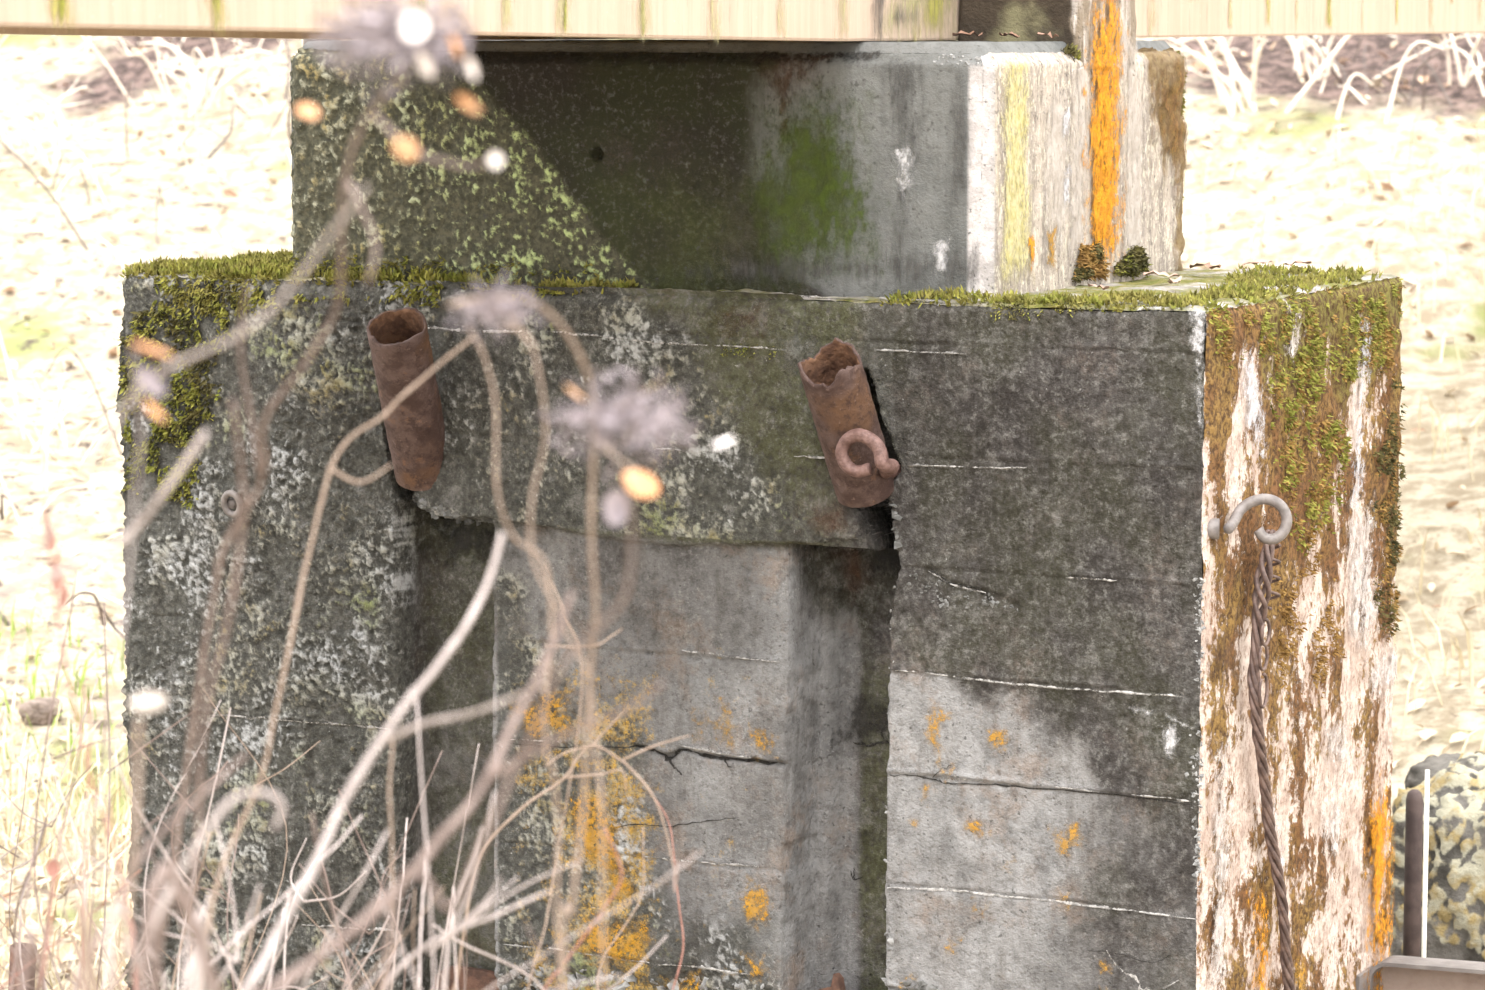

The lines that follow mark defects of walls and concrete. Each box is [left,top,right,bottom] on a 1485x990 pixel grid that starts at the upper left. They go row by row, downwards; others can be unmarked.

damp [858,243,976,280]
crack [510,739,784,775]